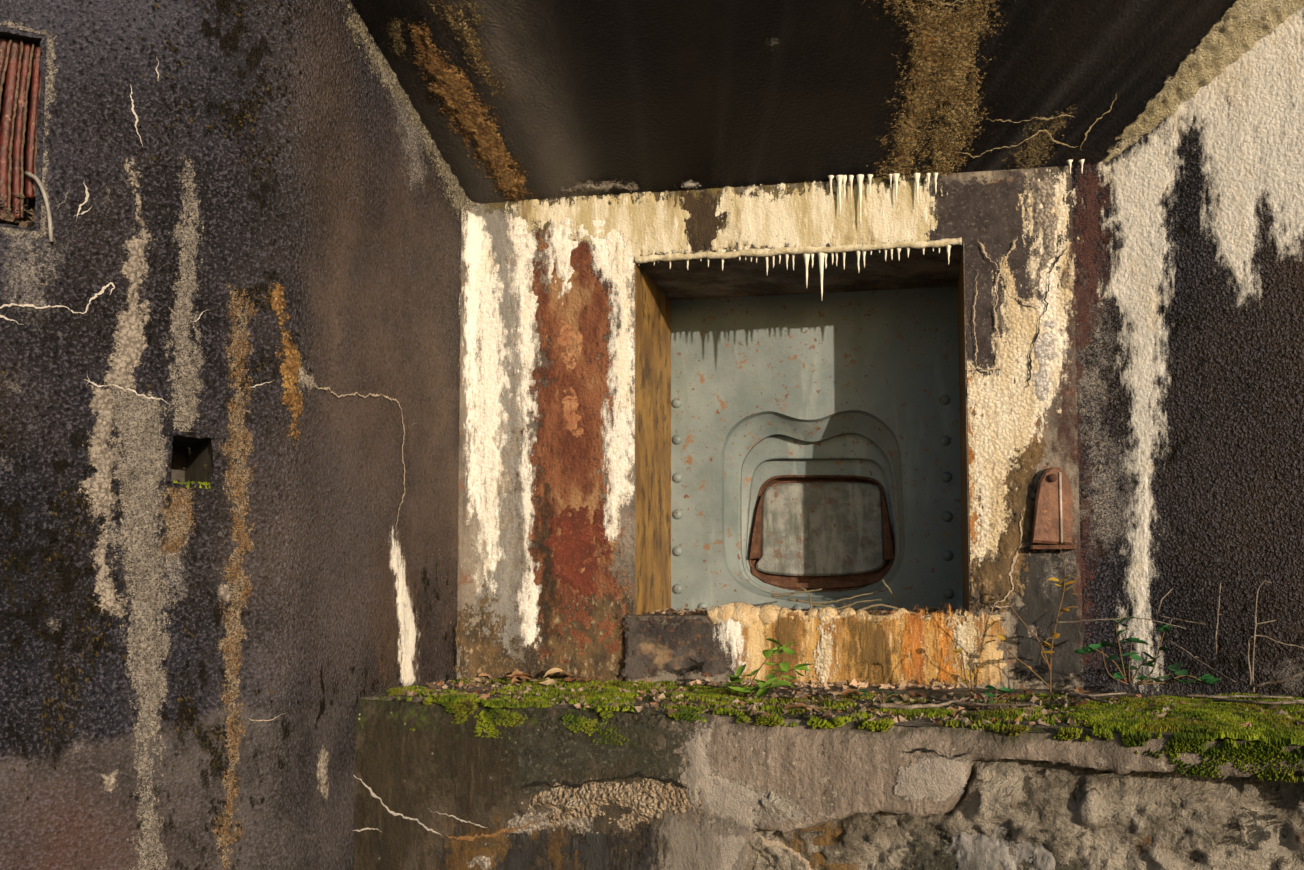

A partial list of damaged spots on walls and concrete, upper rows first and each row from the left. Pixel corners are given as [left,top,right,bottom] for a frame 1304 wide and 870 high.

crack [0,282,115,325]
water stain [76,156,211,870]
water stain [211,283,259,870]
crack [396,416,416,525]
corrosion [514,221,1006,689]
water stain [339,0,1304,691]
spalling [504,720,1304,870]